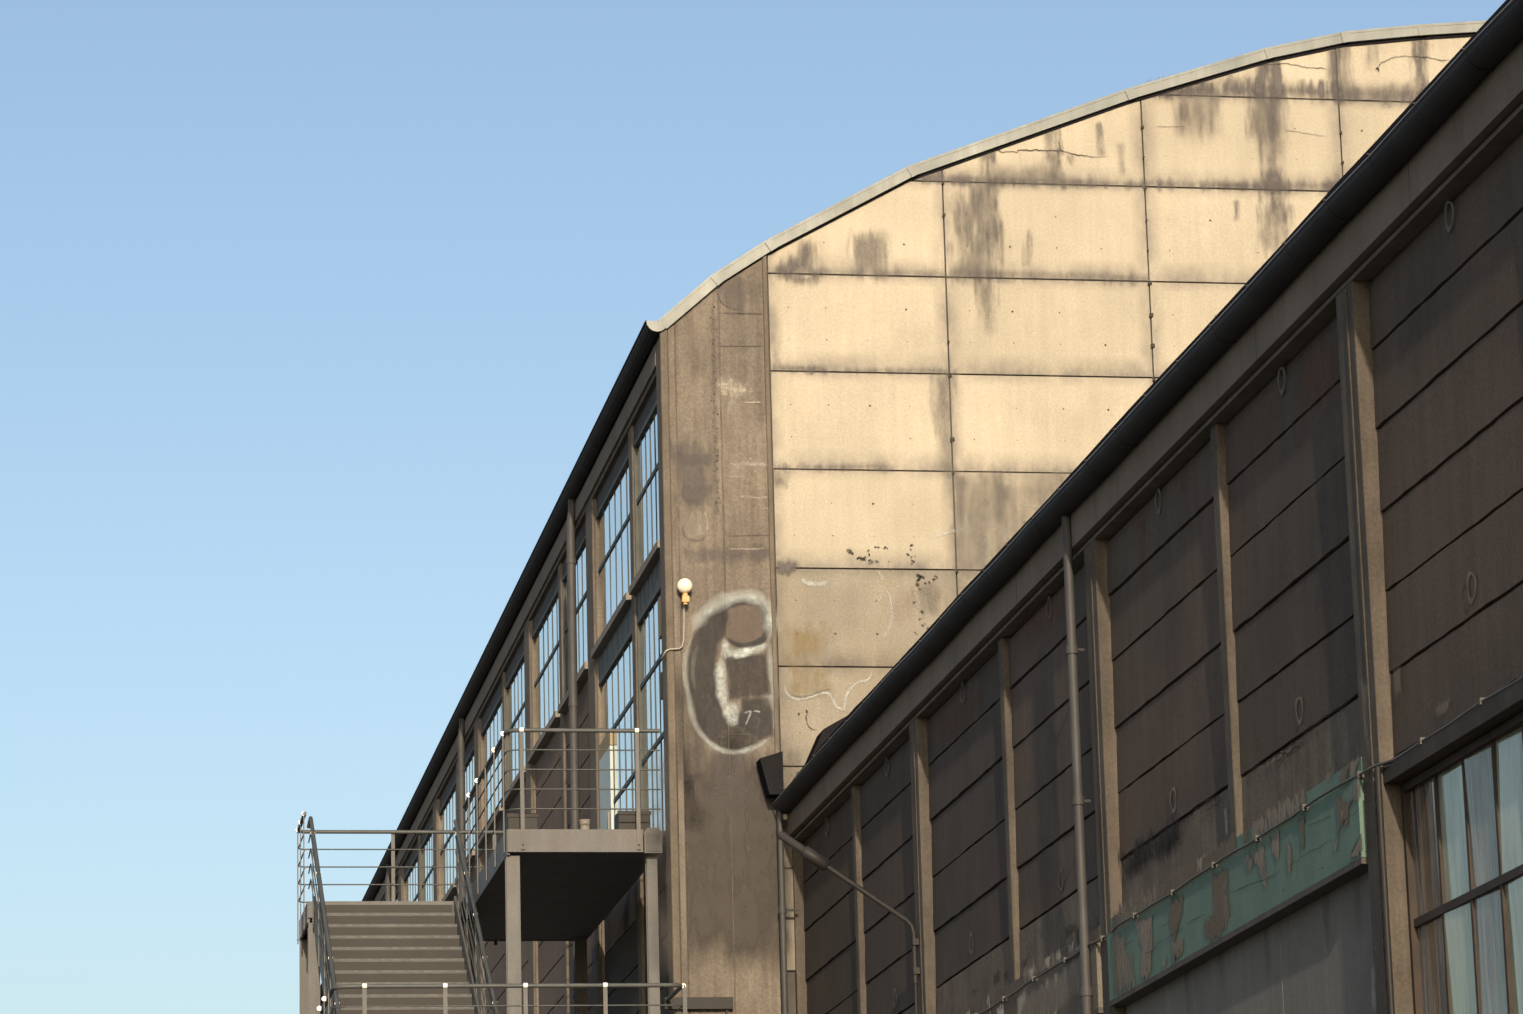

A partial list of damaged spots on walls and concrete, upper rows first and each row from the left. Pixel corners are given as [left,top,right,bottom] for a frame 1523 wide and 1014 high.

water stain [1159,40,1426,221]
water stain [921,152,1107,249]
peeling [1244,788,1305,887]
peeling [967,939,1081,1014]
peeling [1135,893,1183,980]
peeling [1204,868,1230,943]